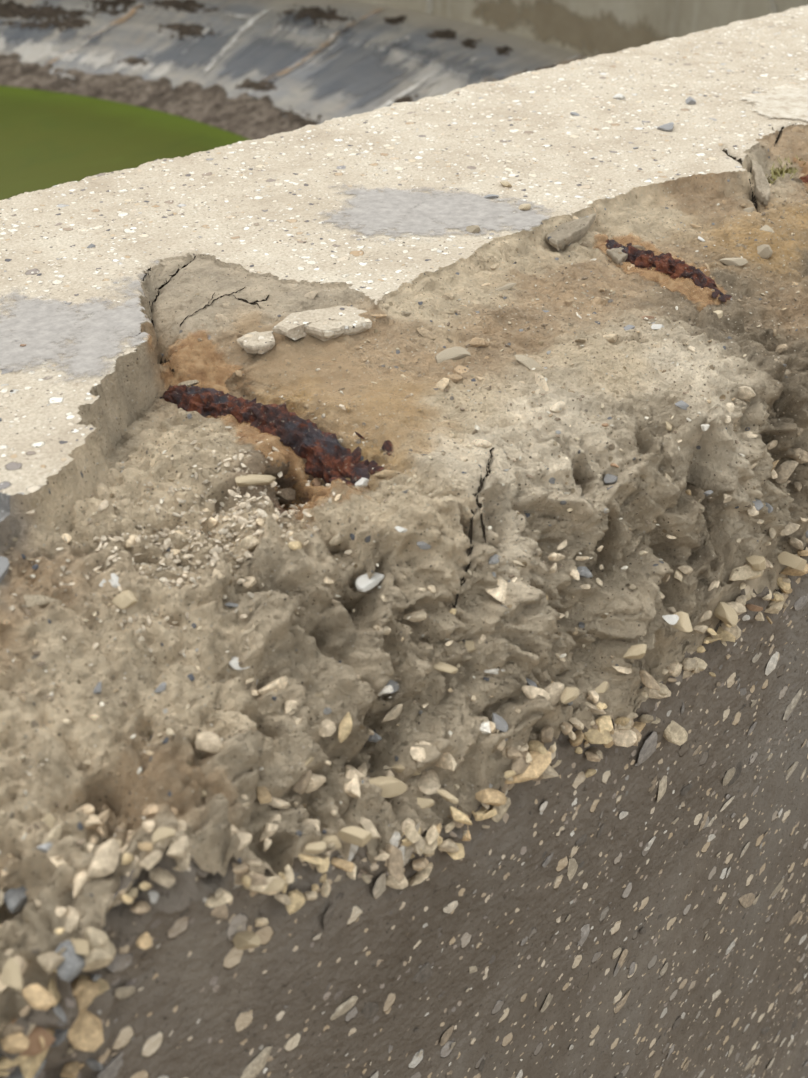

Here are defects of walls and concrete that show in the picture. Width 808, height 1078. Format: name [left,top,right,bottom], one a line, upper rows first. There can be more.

spalling [751,160,770,207]
peeling [321,187,550,237]
spalling [545,213,596,251]
corrosion [595,233,732,310]
peeling [0,292,150,380]
spalling [237,331,275,354]
spalling [273,305,372,341]
corrosion [159,331,394,521]
spalling [0,492,11,522]
spalling [663,720,688,746]
spalling [263,878,286,892]
spalling [0,927,116,1078]